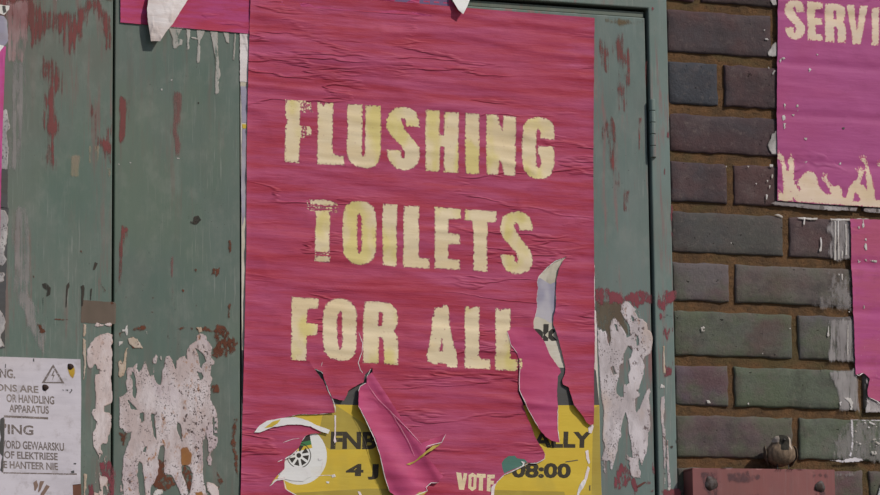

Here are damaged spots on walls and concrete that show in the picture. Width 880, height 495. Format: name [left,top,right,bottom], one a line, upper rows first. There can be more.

peeling [0,0,111,53]
peeling [43,58,63,164]
peeling [97,96,126,155]
corrosion [196,304,238,358]
peeling [71,323,219,495]
peeling [595,288,681,495]